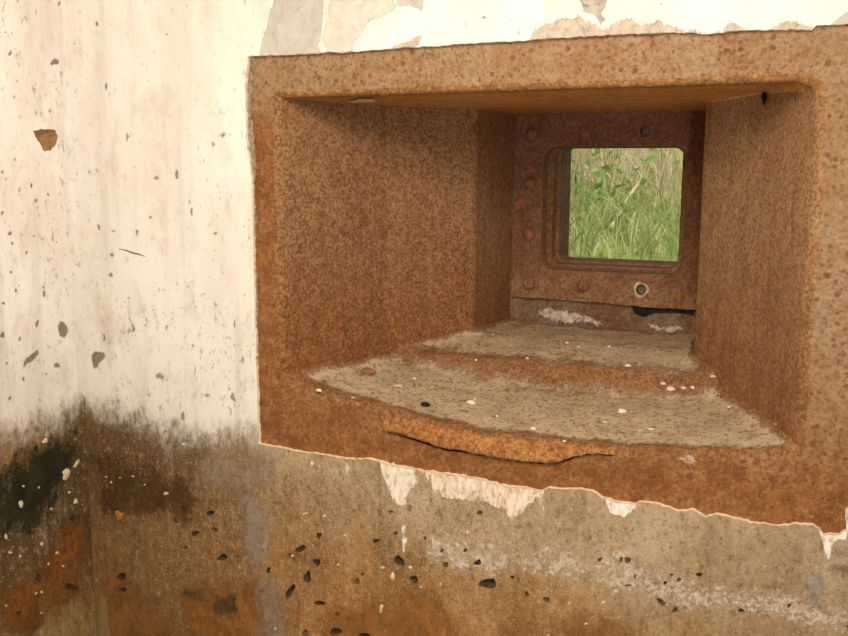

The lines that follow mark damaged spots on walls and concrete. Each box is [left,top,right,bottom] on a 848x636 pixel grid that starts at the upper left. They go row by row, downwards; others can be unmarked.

peeling [259,0,423,56]
peeling [530,0,702,40]
peeling [831,12,848,25]
crack [385,433,614,464]
water stain [0,399,848,636]